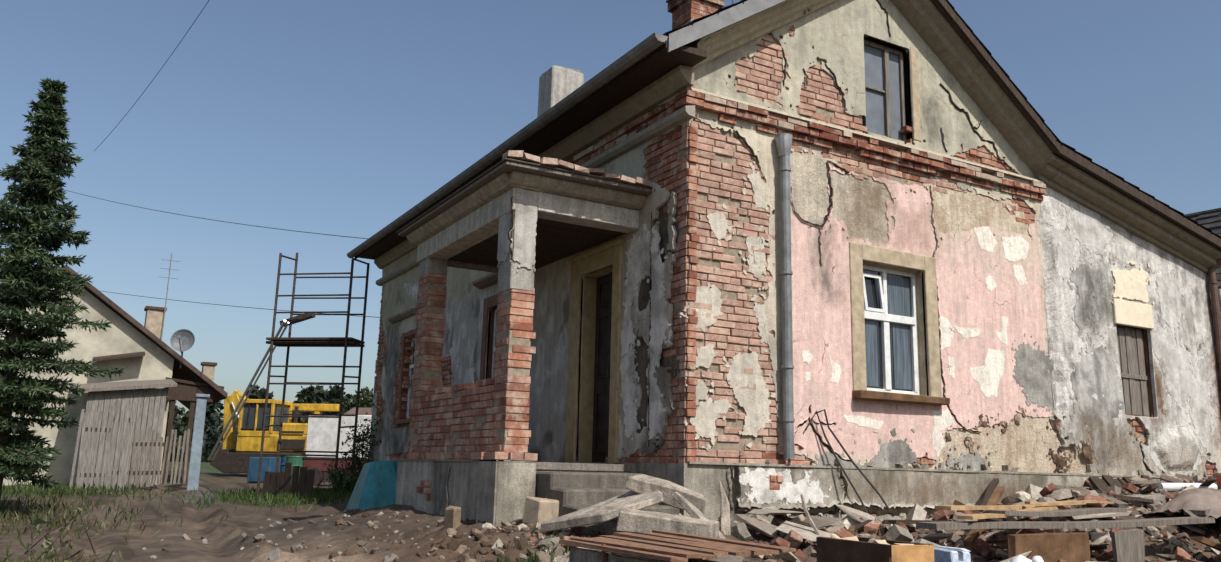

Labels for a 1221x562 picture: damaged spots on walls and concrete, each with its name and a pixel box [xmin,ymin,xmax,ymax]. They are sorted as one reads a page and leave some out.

flaking render [734,25,867,133]
crack [940,83,1015,172]
flaking render [605,118,982,548]
flaking render [790,140,1034,286]
crack [930,185,981,433]
peeling [970,316,1008,398]
peeling [985,276,996,291]
flaking render [912,394,1107,520]
peeling [1057,202,1114,283]
peeling [1122,269,1221,528]